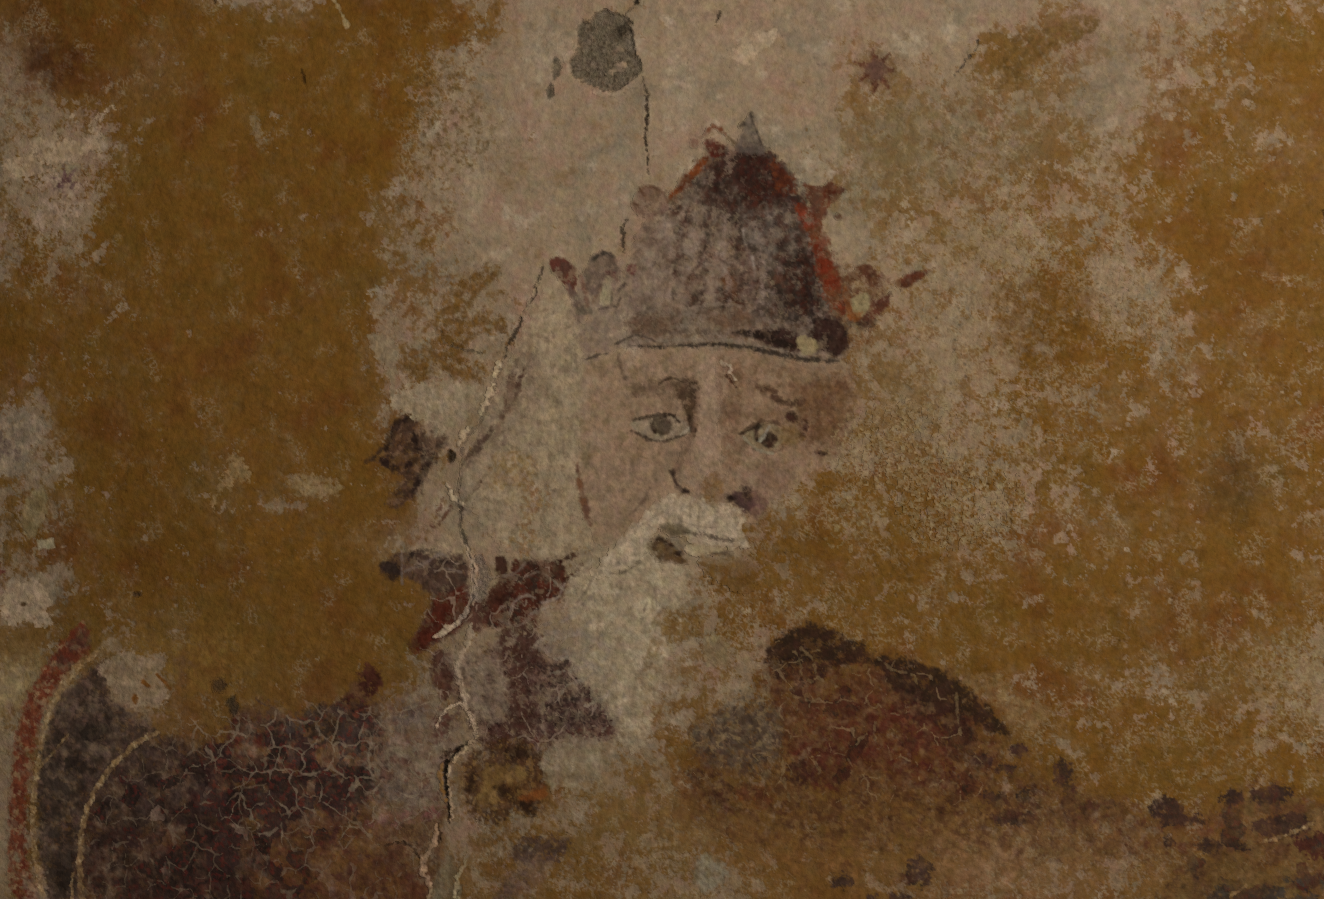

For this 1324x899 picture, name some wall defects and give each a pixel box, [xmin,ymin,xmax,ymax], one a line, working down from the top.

crack [625,0,643,15]
damp [989,4,1104,95]
crack [639,71,653,175]
damp [856,95,963,217]
damp [987,268,1103,381]
damp [1189,423,1269,529]
crack [82,266,614,899]